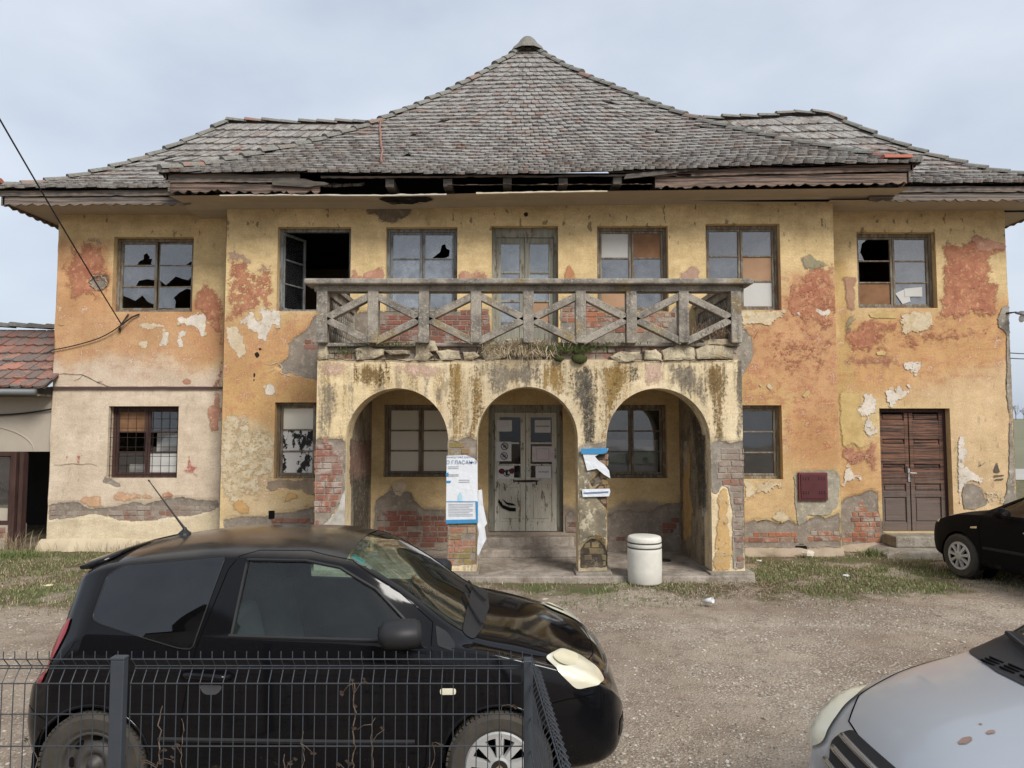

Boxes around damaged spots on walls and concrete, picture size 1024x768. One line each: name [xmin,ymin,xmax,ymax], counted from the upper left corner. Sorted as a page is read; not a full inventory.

peeling [62,239,109,298]
peeling [138,251,281,358]
peeling [48,362,372,528]
damp [321,383,339,428]
damp [489,363,541,394]
damp [560,364,638,443]
flaking render [279,235,1016,551]
damp [669,364,716,423]
flaking render [578,440,733,572]